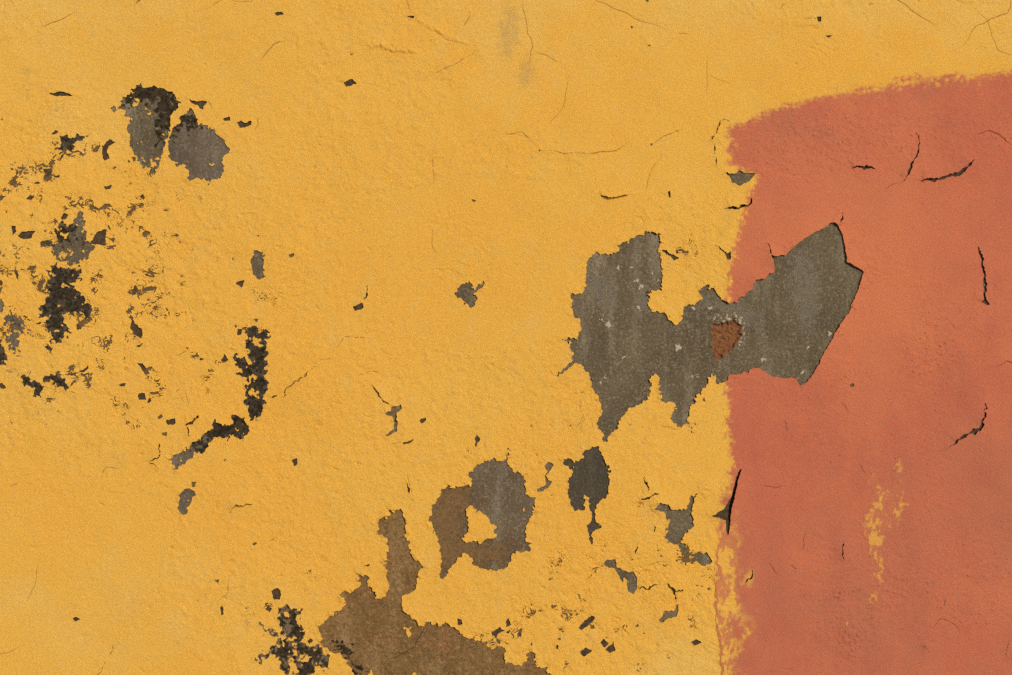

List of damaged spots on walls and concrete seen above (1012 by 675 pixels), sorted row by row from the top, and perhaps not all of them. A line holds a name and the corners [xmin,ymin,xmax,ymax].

crack [852,133,974,189]
peeling [0,74,252,430]
crack [978,247,987,300]
peeling [383,403,413,444]
peeling [424,212,871,597]
crack [953,403,987,445]
peeling [307,508,645,675]
peeling [652,479,719,645]